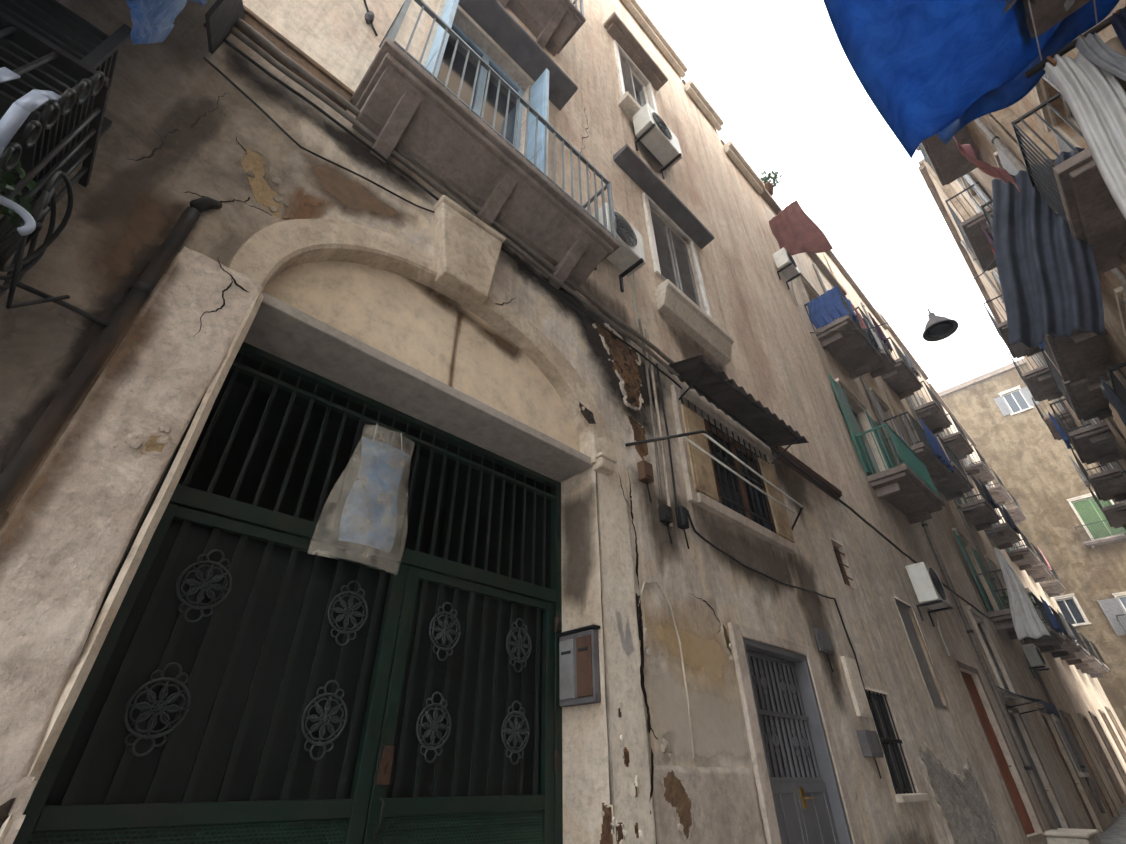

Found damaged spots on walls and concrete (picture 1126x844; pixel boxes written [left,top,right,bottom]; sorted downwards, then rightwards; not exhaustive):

damp [84,100,220,295]
crack [193,260,251,339]
flaking render [592,323,650,462]
crack [618,473,660,844]
flaking render [0,777,37,844]
flaking render [598,800,643,844]
peeling [620,735,642,799]
flaking render [659,737,695,843]